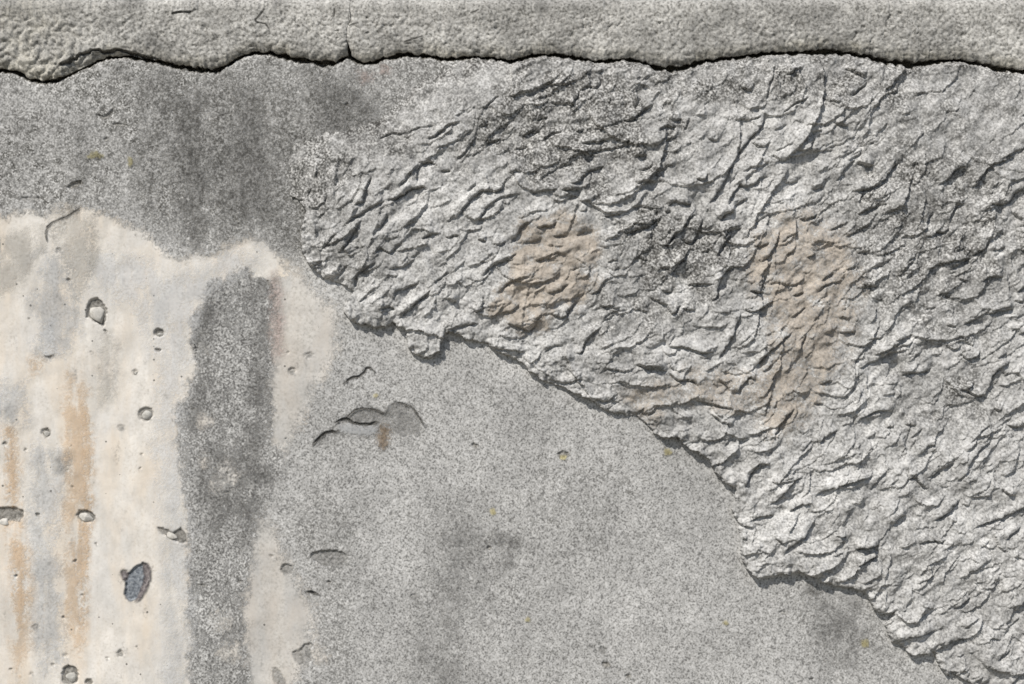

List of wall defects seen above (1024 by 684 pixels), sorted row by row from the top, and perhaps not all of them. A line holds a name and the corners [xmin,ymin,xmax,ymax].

crack [0,8,1024,84]
peeling [0,202,346,684]
leakage [87,250,287,684]
spalling [312,402,425,448]
spalling [488,211,601,334]
spalling [747,211,855,430]